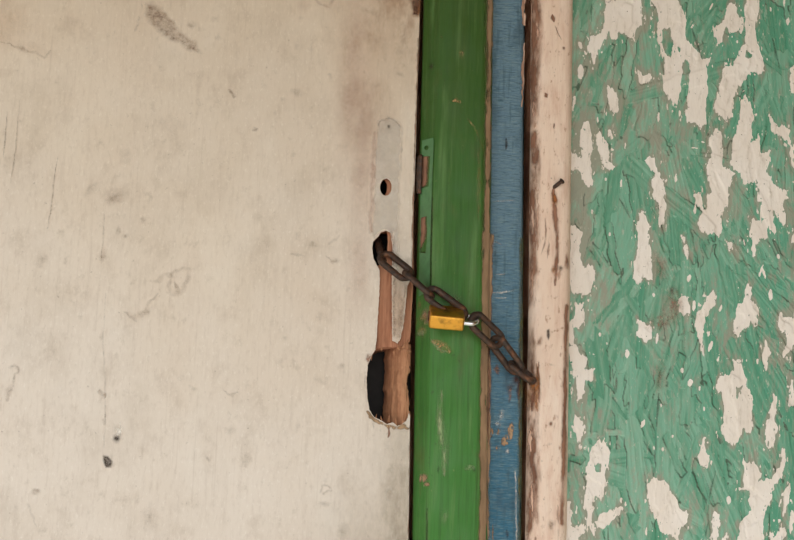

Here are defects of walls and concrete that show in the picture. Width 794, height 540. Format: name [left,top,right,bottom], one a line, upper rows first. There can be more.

peeling [578,0,794,257]
peeling [521,0,627,540]
peeling [636,319,659,344]
peeling [631,156,677,297]
peeling [678,290,722,361]
peeling [733,284,760,337]
peeling [713,312,794,446]
peeling [645,477,689,540]
peeling [697,437,712,469]
peeling [701,376,794,540]